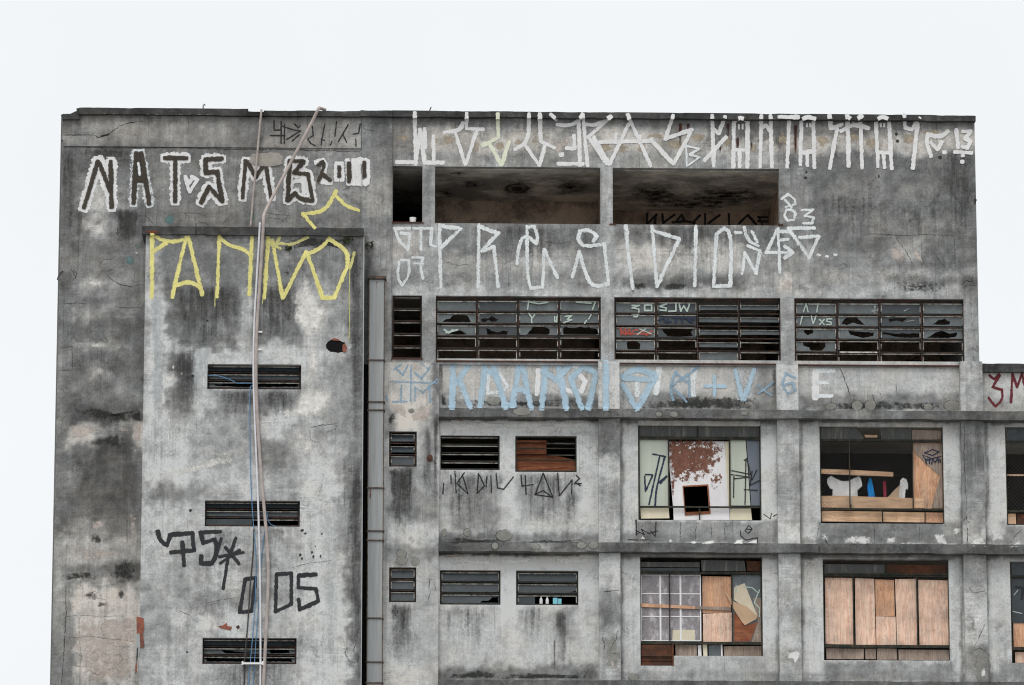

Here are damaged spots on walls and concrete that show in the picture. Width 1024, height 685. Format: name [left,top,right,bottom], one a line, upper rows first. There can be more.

crack [66,121,373,152]
water stain [500,182,534,196]
spalling [326,338,347,353]
crack [827,369,897,410]
water stain [83,409,140,421]
water stain [97,436,124,447]
water stain [115,560,134,578]